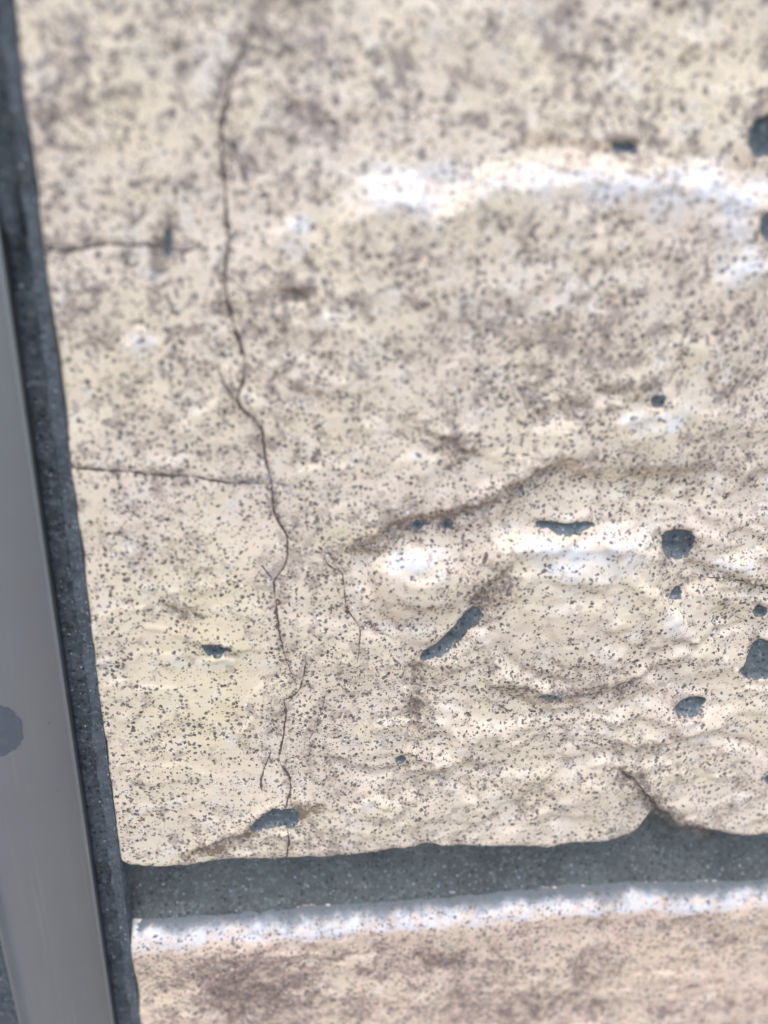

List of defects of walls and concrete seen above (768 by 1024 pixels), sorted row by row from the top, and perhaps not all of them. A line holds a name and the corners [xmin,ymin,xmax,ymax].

crack [42,243,196,253]
crack [71,32,325,858]